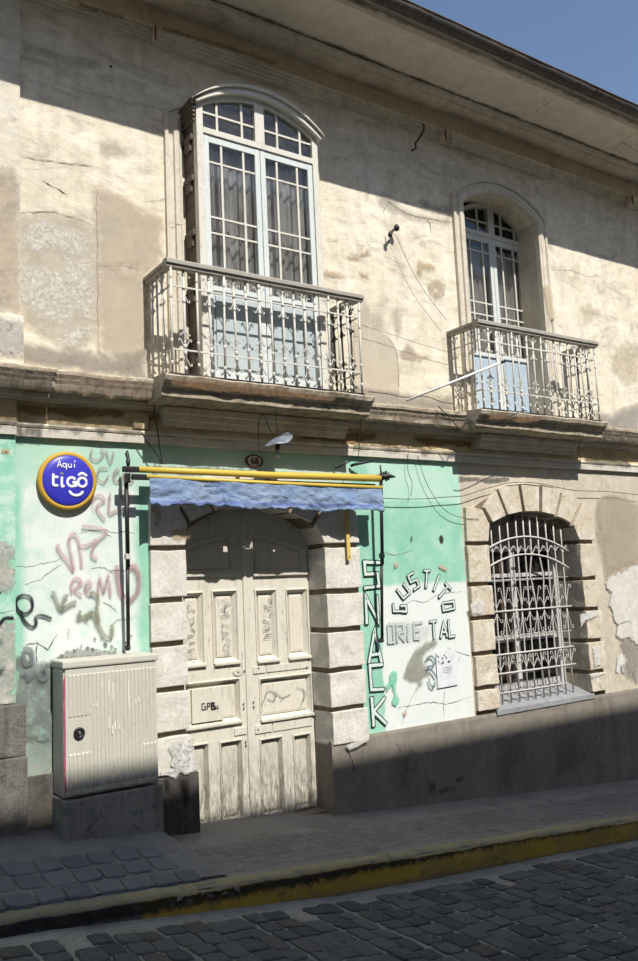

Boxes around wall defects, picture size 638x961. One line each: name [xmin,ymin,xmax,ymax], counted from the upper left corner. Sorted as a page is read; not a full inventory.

peeling [0,173,94,356]
peeling [606,565,638,645]
peeling [160,739,197,779]